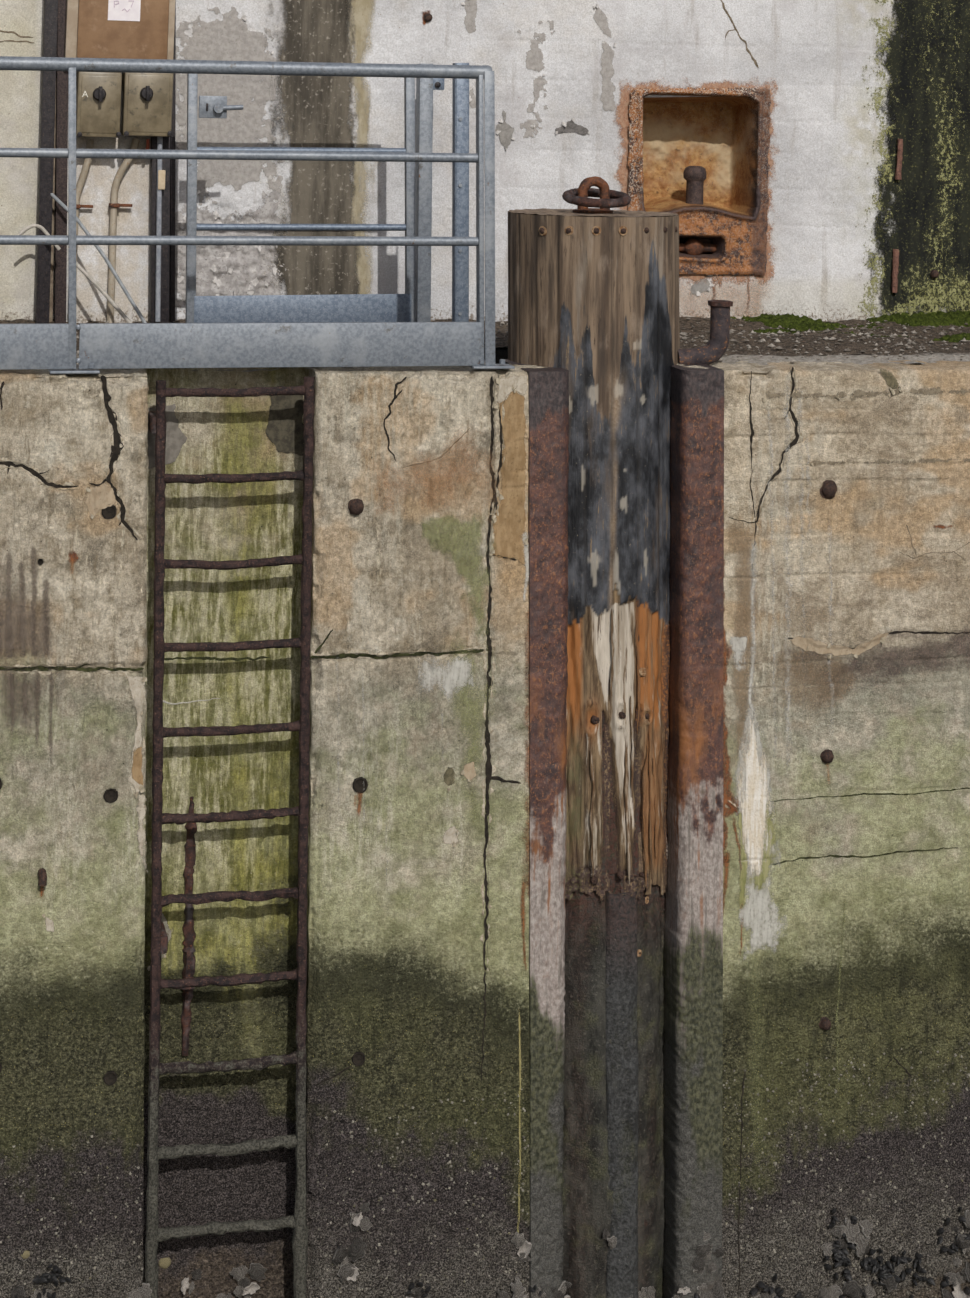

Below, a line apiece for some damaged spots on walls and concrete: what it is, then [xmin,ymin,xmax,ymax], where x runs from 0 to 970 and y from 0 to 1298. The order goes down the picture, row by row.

damp [271,0,374,295]
peeling [461,0,477,33]
peeling [495,20,591,150]
peeling [593,4,616,111]
rust [616,80,778,296]
damp [858,0,970,317]
crack [0,375,141,540]
crack [729,367,803,582]
crack [310,376,520,1085]
rust [723,630,742,906]
damp [732,529,783,958]
rust [521,803,529,969]